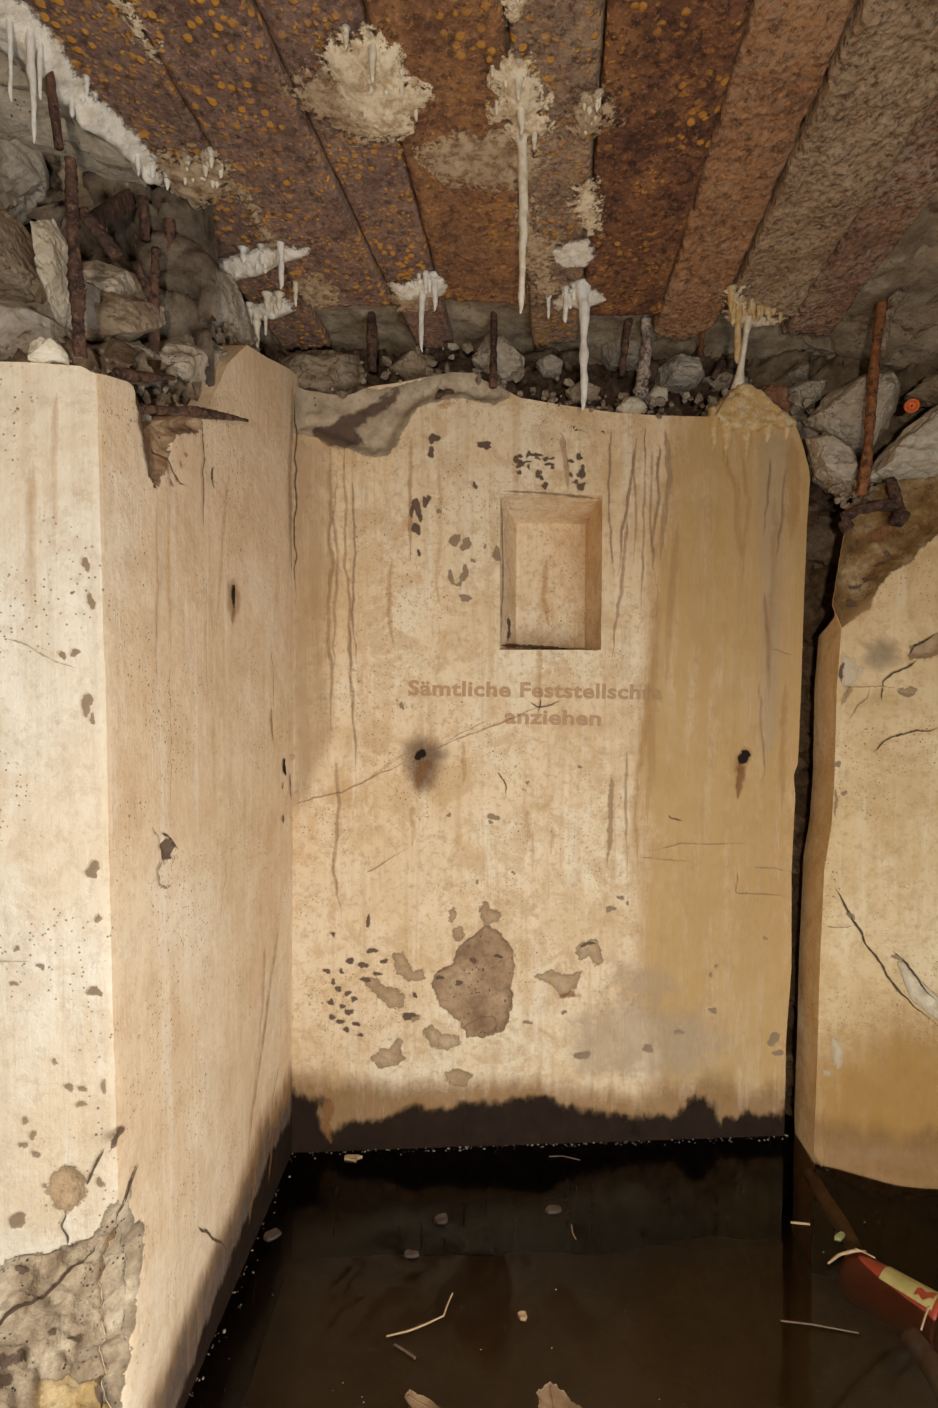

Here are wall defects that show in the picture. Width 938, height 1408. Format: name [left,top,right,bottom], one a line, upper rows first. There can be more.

spalling [45,71,176,359]
water stain [0,0,348,348]
water stain [278,21,625,411]
water stain [27,337,72,365]
spalling [112,367,249,488]
spalling [294,311,510,458]
spalling [513,451,586,491]
water stain [154,270,810,1408]
crack [829,890,938,1026]
spalling [0,1126,145,1408]
spalling [64,1079,106,1107]
water stain [812,1037,938,1292]